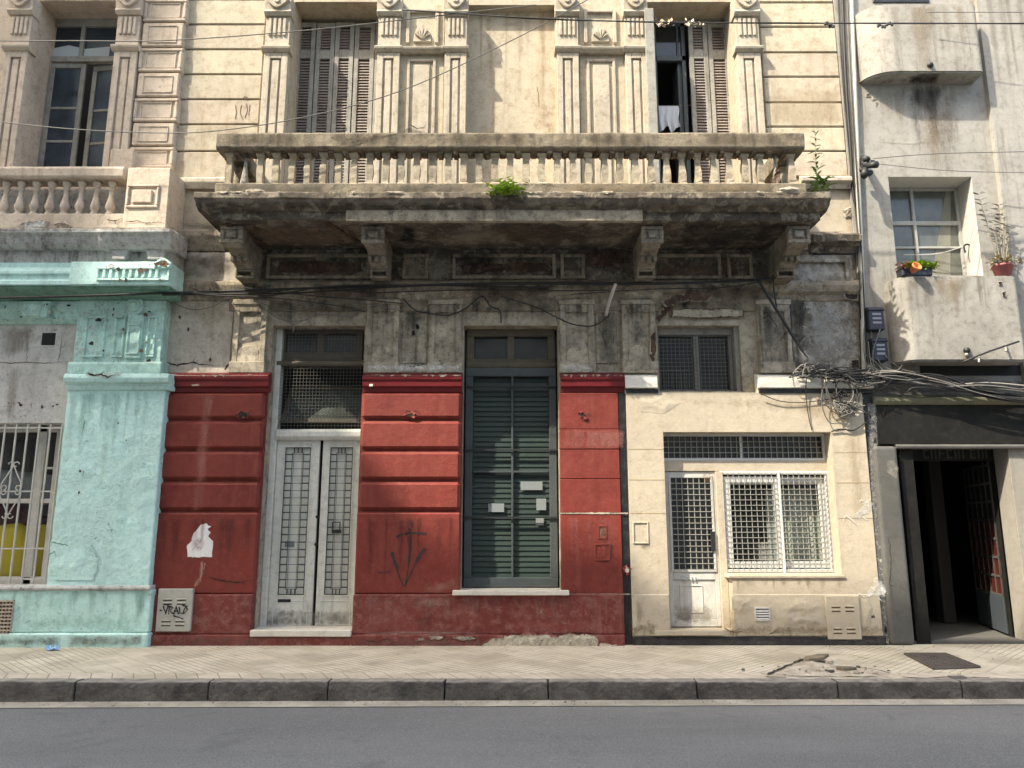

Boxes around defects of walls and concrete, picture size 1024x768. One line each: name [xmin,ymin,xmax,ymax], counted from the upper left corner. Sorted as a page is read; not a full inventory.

leakage [910,75,952,147]
peeling [627,289,744,362]
crack [0,330,120,379]
crack [167,360,229,369]
spalling [414,631,619,646]